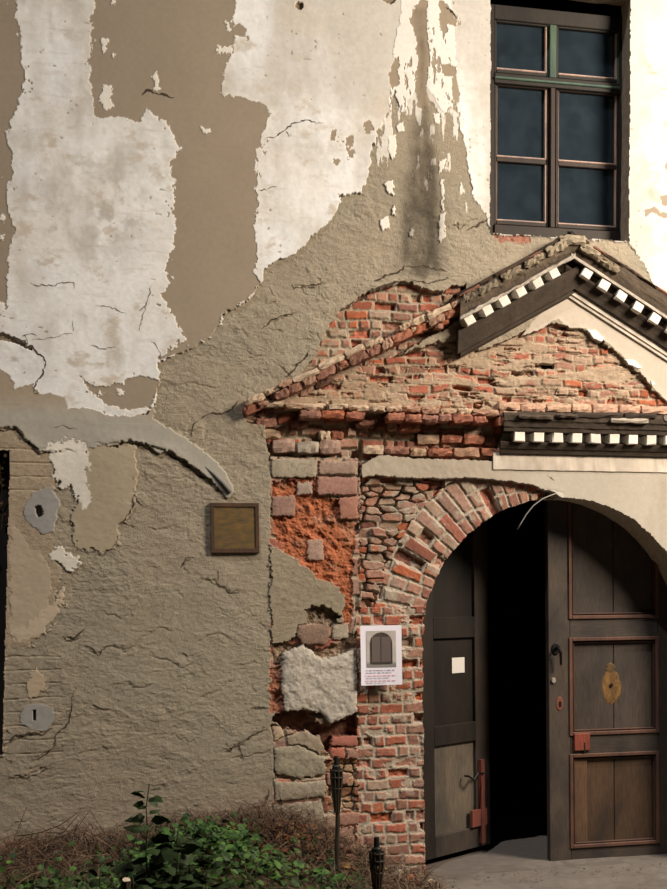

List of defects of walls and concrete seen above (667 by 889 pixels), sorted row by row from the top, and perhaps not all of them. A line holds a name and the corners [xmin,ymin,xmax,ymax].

water stain [376,0,467,272]
peeling [638,195,667,219]
flaking render [587,239,652,283]
flaking render [261,314,667,481]
flaking render [0,0,556,847]
crack [180,557,240,594]
crack [62,627,126,656]
crack [4,687,77,779]
crack [223,729,268,759]